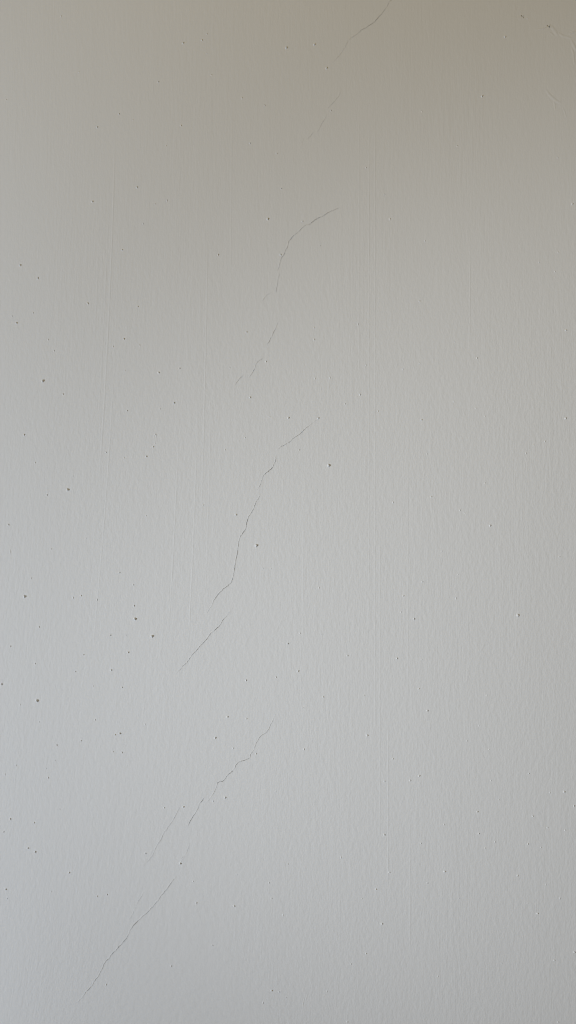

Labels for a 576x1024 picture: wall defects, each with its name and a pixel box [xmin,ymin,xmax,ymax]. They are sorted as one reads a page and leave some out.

crack [235,207,340,387]
crack [175,420,317,674]
crack [76,714,275,1004]